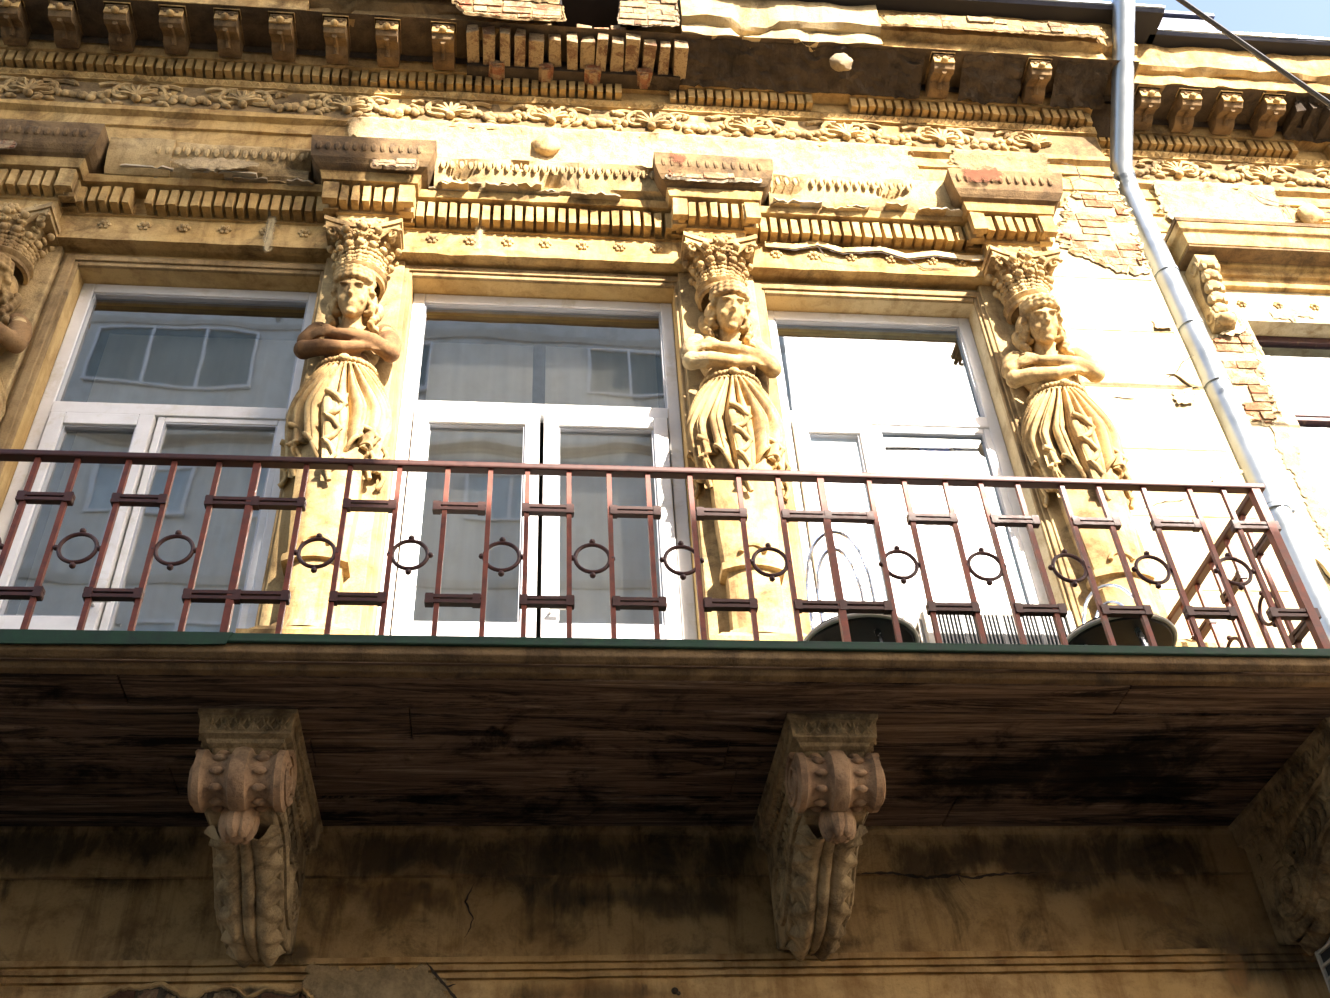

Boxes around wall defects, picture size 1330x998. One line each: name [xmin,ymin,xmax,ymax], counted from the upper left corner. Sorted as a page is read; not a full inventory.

flaking render [617,0,680,27]
peeling [949,148,1053,172]
flaking render [1056,171,1152,275]
flaking render [1211,316,1330,548]
leakage [901,724,1225,808]
leakage [0,827,196,873]
leakage [337,806,752,921]
leakage [898,834,1207,889]
peeling [99,962,452,998]